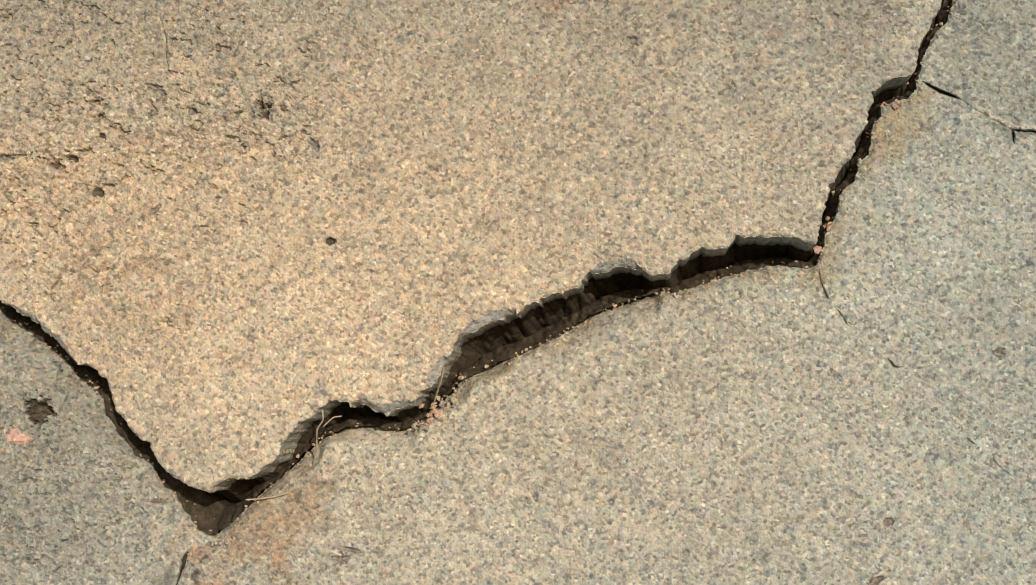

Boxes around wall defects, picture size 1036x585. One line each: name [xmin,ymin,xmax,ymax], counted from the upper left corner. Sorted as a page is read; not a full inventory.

crack [430,0,959,409]
crack [0,300,450,535]
crack [176,543,203,585]